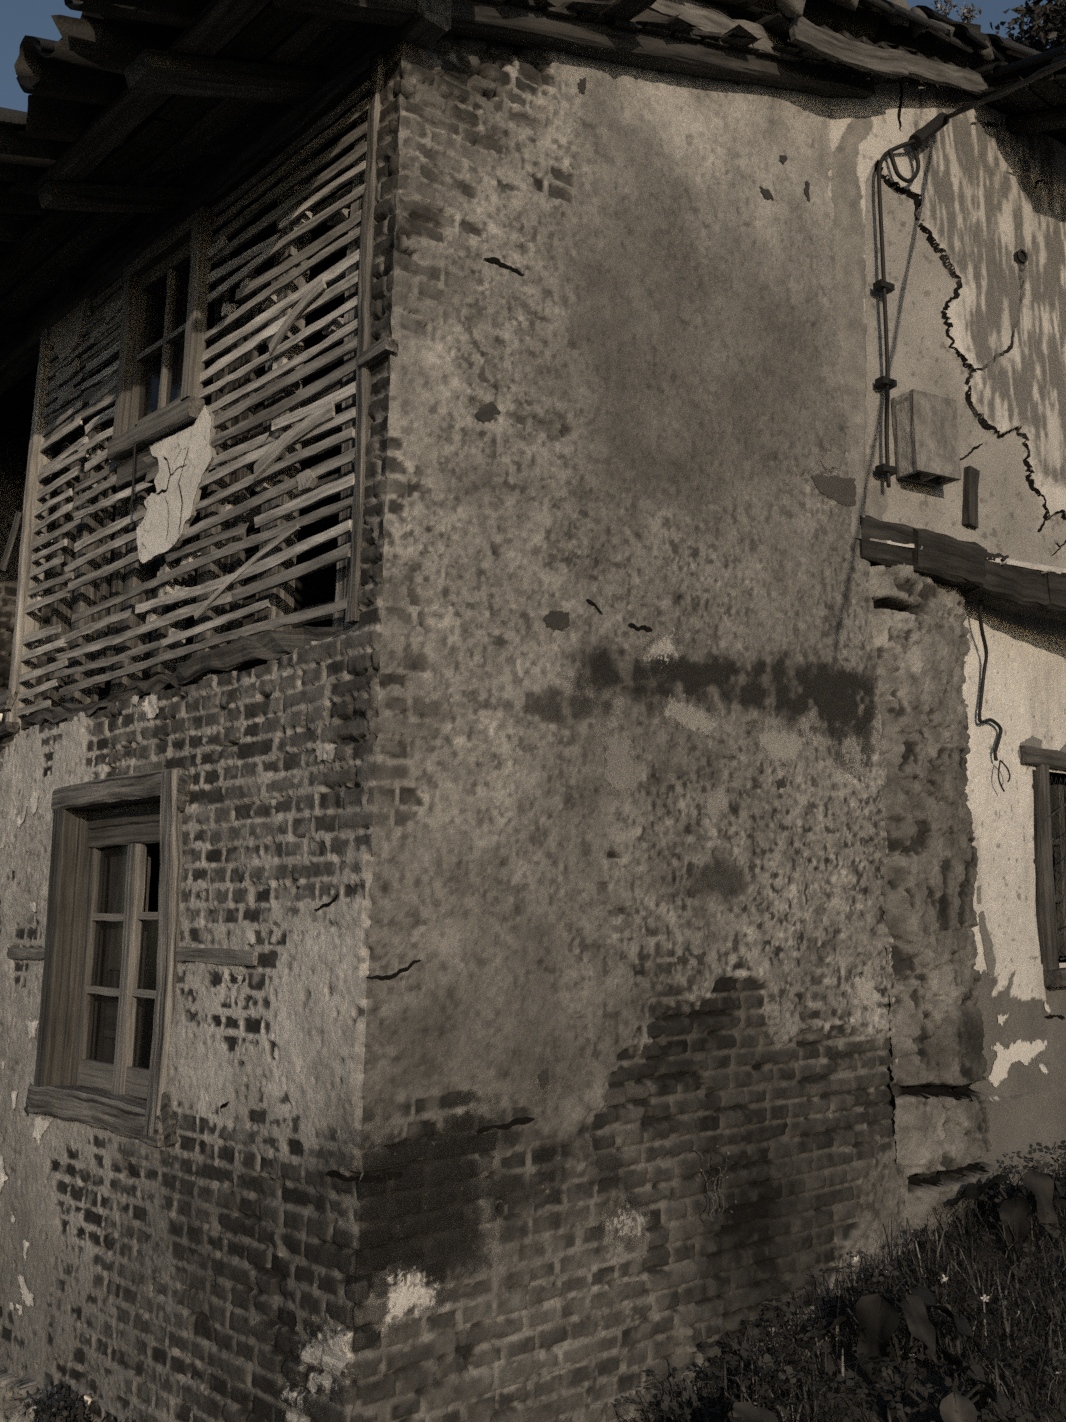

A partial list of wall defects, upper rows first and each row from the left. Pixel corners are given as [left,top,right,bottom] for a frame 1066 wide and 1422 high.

crack [896,83,904,131]
crack [971,119,1003,127]
crack [875,159,1066,556]
spalling [145,406,217,564]
leakage [525,649,876,771]
peeling [244,926,256,945]
peeling [27,1020,38,1039]
peeling [968,971,1066,1100]
peeling [32,1116,51,1144]
peeling [0,1155,8,1194]
flaking render [49,1140,146,1239]
peeling [10,1239,34,1316]